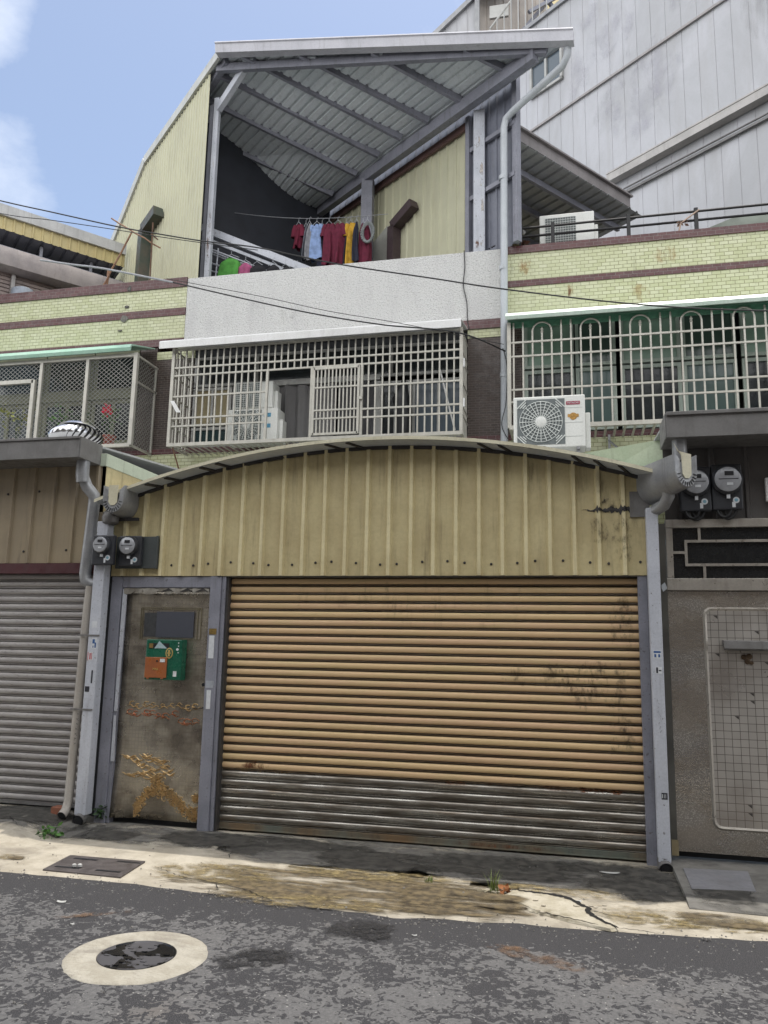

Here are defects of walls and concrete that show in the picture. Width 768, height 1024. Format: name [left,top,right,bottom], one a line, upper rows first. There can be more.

leakage [0,805,768,931]
crack [498,887,663,934]